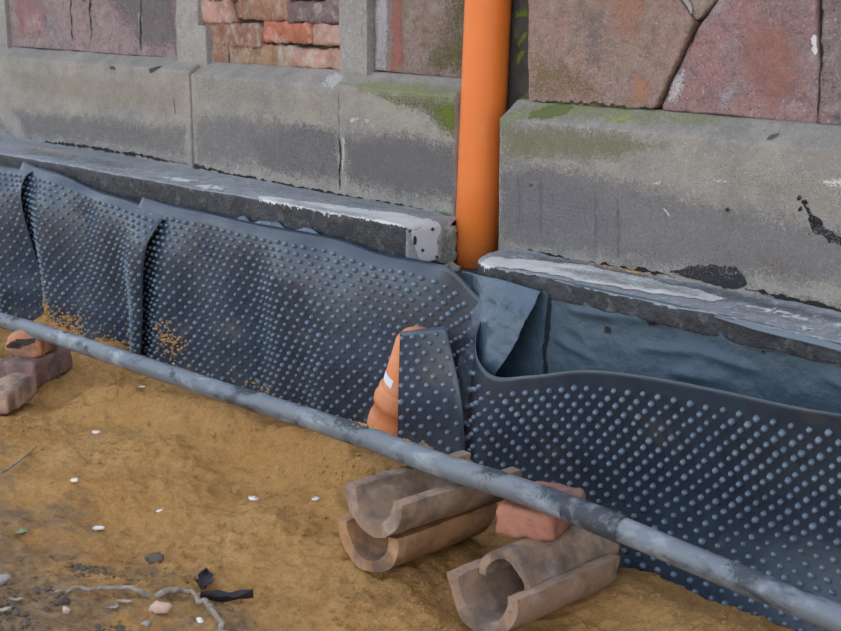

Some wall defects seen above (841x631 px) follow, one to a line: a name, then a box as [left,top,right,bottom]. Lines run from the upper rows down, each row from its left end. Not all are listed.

crack [70,0,92,41]
crack [136,4,144,50]
crack [663,1,718,103]
crack [816,0,824,122]
damp [0,107,455,220]
damp [498,120,841,332]
crack [745,288,841,312]